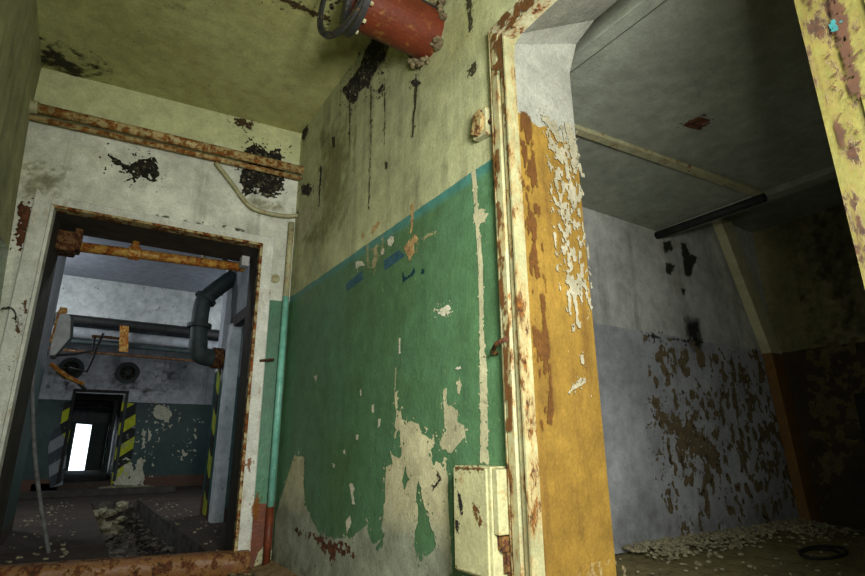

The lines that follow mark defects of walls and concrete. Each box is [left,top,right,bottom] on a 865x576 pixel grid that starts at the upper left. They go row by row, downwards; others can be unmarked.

leakage [39,37,109,78]
leakage [261,0,344,30]
corrosion [825,0,865,104]
leakage [368,86,387,210]
corrosion [834,113,861,158]
peeling [404,199,419,261]
corrosion [492,142,513,432]
corrosion [521,111,554,430]
peeling [540,108,593,331]
peeling [254,366,468,576]
peeling [643,338,795,535]